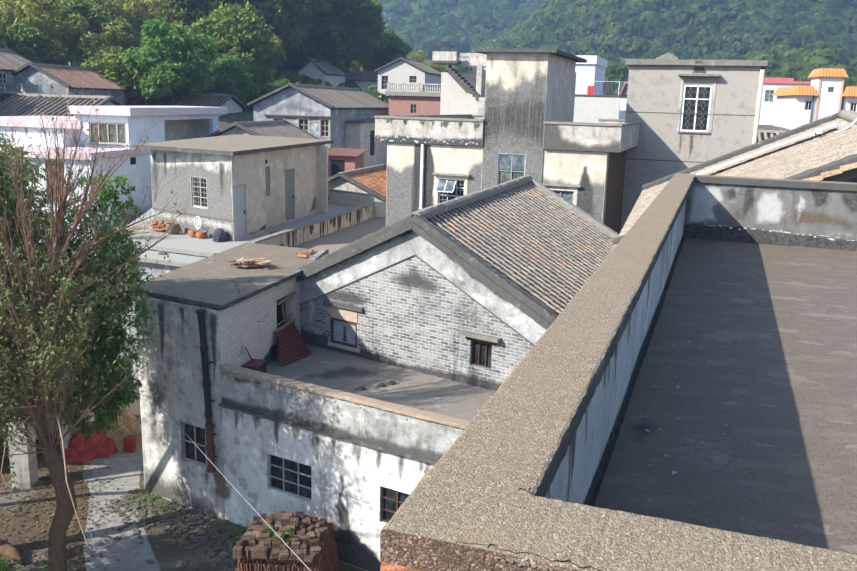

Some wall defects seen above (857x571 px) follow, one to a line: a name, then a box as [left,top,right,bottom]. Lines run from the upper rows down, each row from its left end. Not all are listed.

leakage [375,75,620,226]
leakage [115,153,233,241]
leakage [397,269,436,291]
spalling [703,275,857,358]
leakage [151,383,162,409]
leakage [221,396,443,474]
leakage [145,473,215,516]
leakage [333,476,381,571]